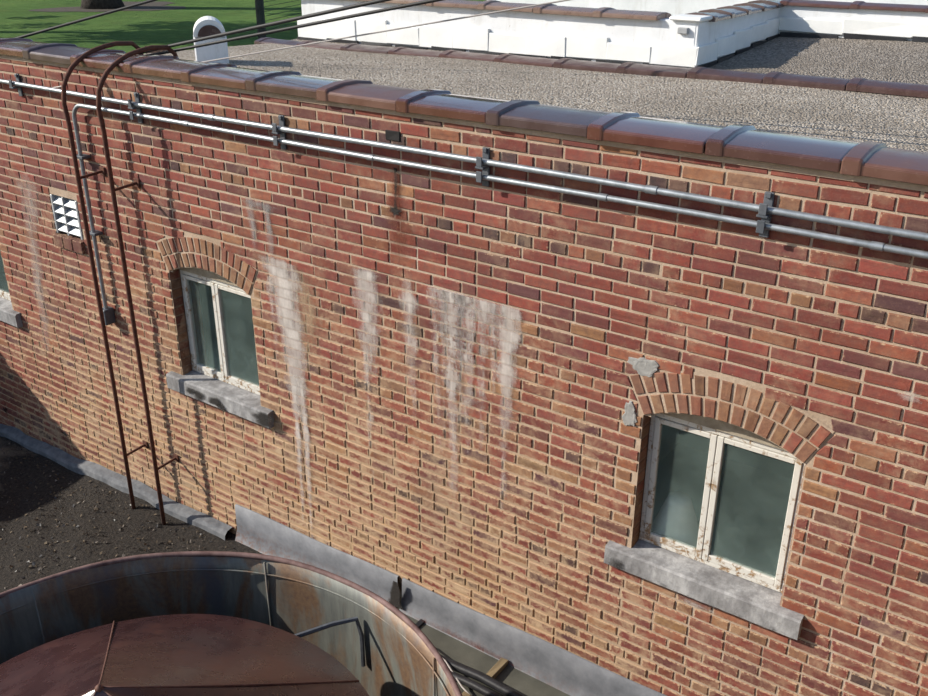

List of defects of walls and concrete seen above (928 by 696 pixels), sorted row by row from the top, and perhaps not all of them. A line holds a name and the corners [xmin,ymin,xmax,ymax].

water stain [266,258,312,489]
water stain [358,271,376,342]
water stain [403,292,415,313]
water stain [435,289,520,403]